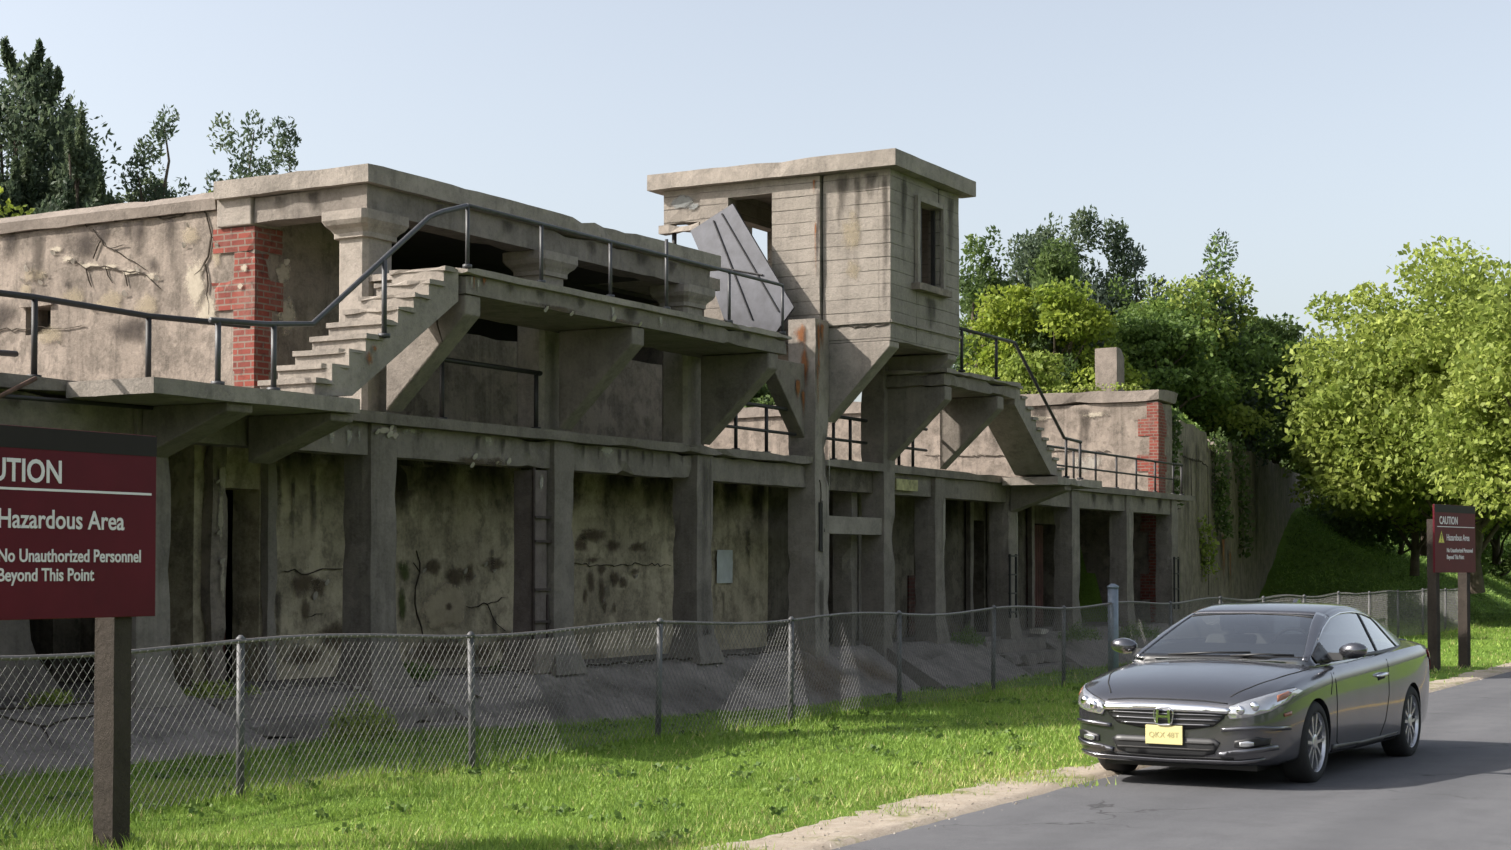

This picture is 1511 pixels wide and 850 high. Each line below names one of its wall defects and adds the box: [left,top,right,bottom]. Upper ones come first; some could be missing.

crack [67,211,221,315]
crack [0,324,79,332]
corrosion [796,324,824,408]
crack [413,551,530,675]
crack [586,651,772,667]